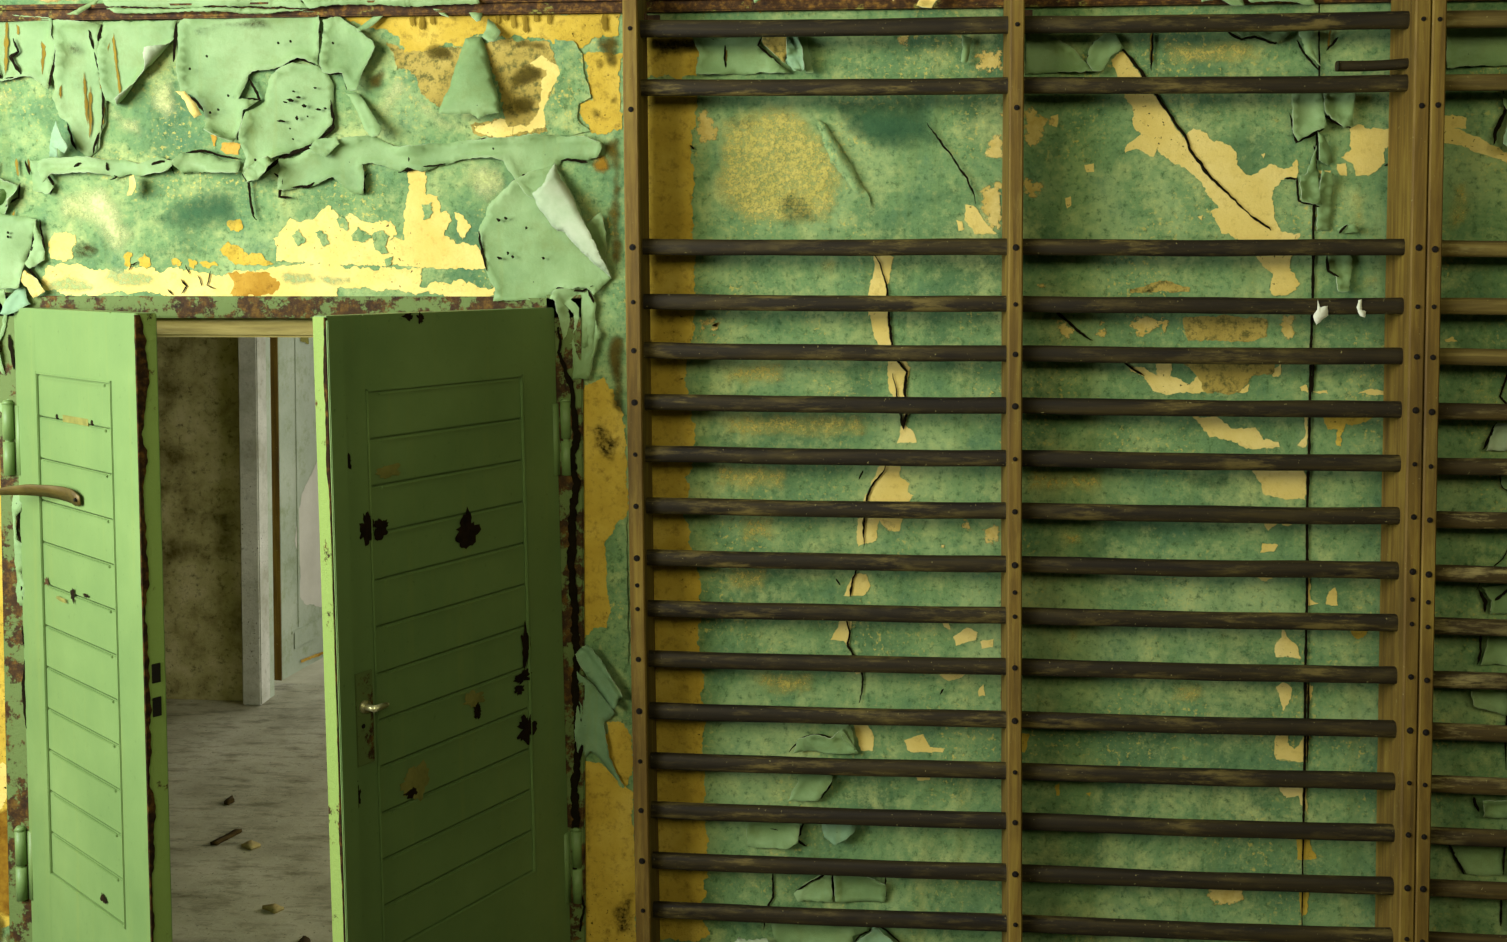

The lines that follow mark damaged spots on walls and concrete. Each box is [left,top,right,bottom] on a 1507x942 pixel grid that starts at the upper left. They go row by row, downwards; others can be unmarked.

rust [4,22,19,73]
rust [83,35,121,138]
crack [1086,33,1271,230]
flaking render [1023,31,1389,296]
crack [1228,4,1339,76]
flaking render [647,37,837,942]
crack [836,466,886,703]
flaking render [856,466,914,546]
crack [875,256,908,429]
flaking render [868,256,917,443]
flaking render [1193,417,1280,449]
crack [1285,113,1351,925]